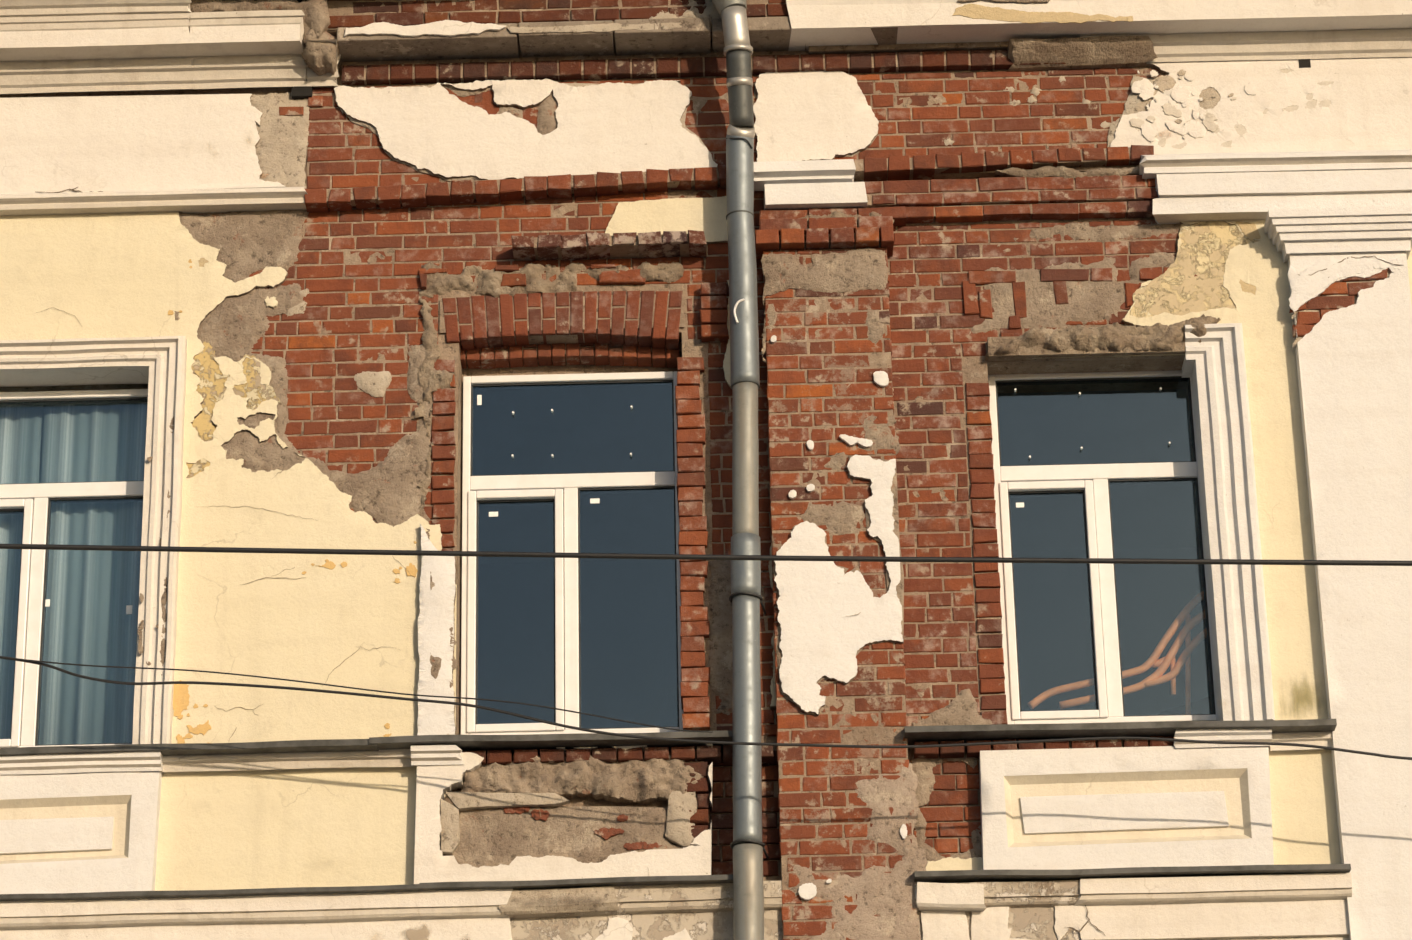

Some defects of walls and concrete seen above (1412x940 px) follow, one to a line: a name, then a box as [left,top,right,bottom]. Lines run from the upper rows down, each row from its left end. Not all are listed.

peeling [1263,81,1334,114]
flaking render [1288,257,1400,349]
flaking render [179,0,1261,940]
peeling [137,577,212,744]
crack [1066,905,1105,935]